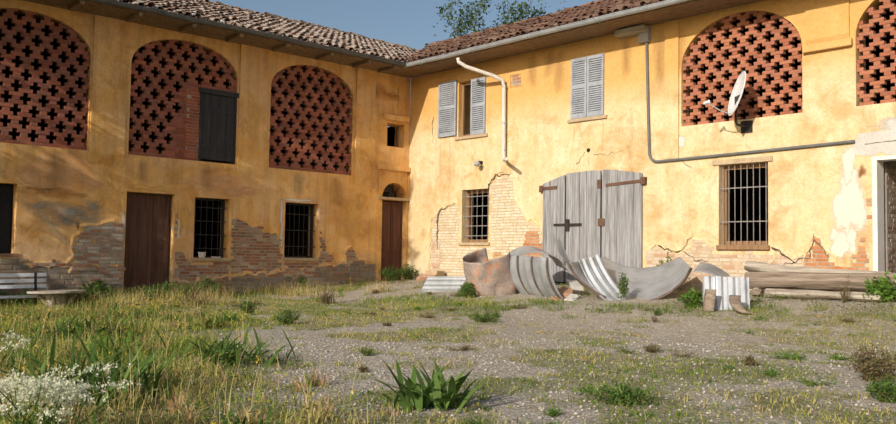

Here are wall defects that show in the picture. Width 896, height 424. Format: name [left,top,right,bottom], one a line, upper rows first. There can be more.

spalling [0,218,126,299]
spalling [173,213,376,295]
spalling [428,172,542,276]
spalling [645,234,869,290]